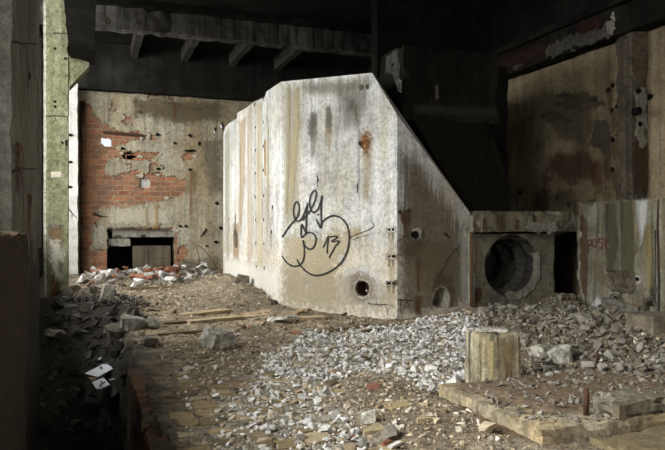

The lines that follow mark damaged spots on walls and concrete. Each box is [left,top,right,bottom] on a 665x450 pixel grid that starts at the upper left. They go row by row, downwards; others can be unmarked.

peeling [545,12,616,59]
spalling [634,87,648,148]
peeling [180,142,200,161]
rust [360,131,372,156]
peeling [60,99,189,273]
spalling [604,269,641,302]